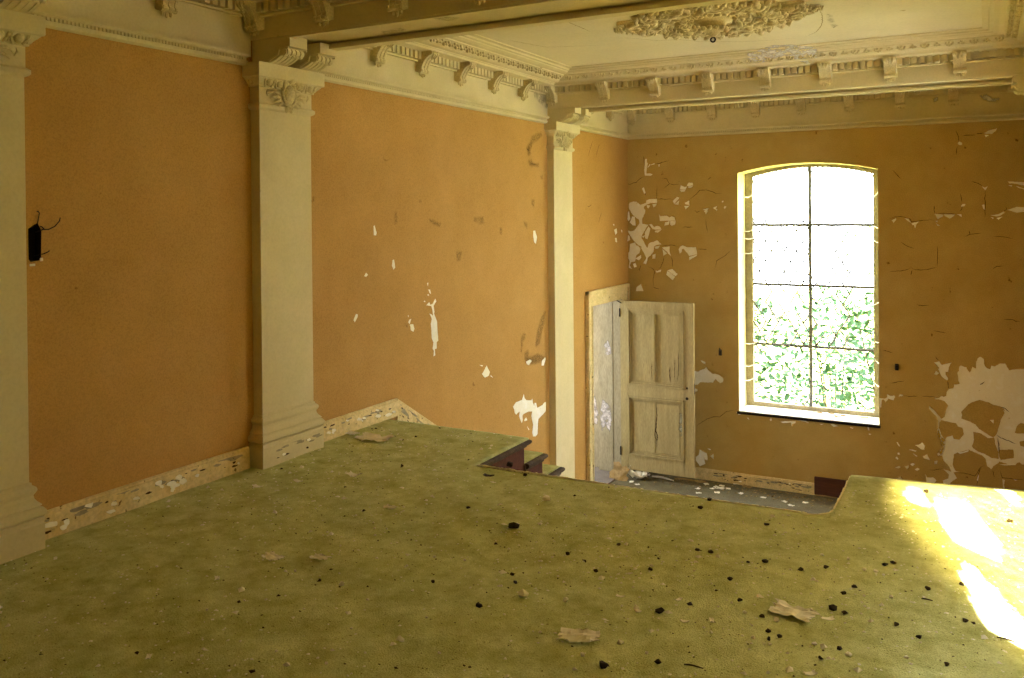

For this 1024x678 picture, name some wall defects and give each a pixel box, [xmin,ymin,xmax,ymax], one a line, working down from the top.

peeling [613,158,698,280]
crack [632,156,729,289]
crack [890,181,1013,274]
peeling [982,205,1024,220]
peeling [424,283,438,356]
peeling [276,404,424,458]
peeling [513,395,546,436]
peeling [695,360,724,392]
peeling [894,356,1024,484]
peeling [45,454,243,534]